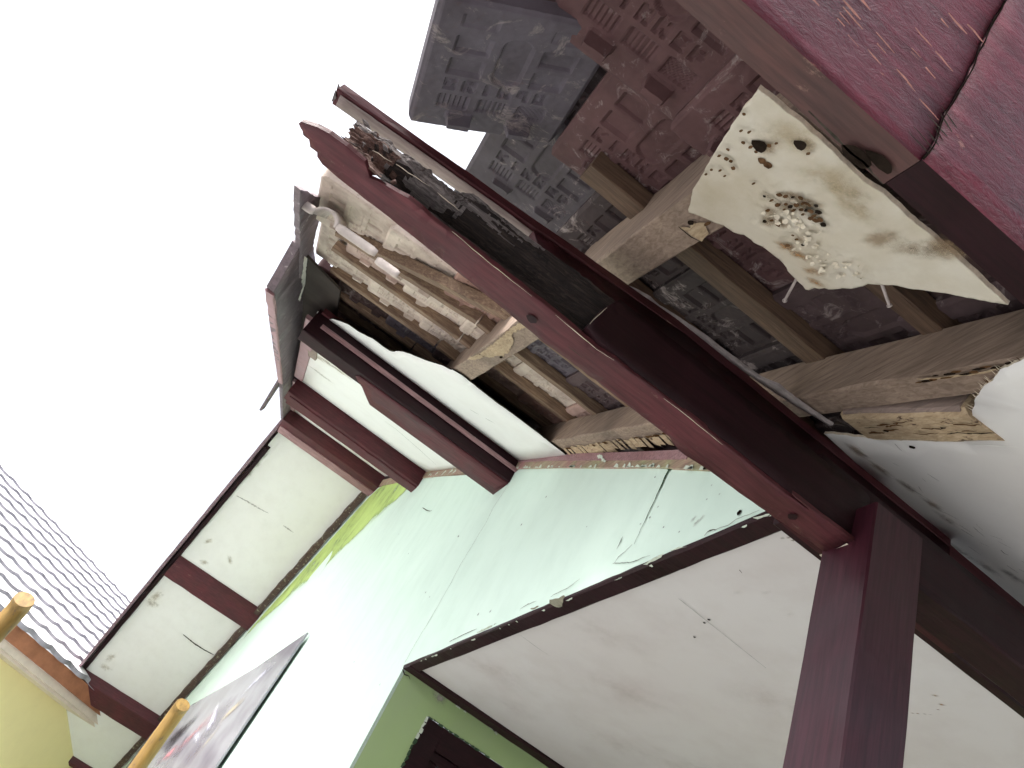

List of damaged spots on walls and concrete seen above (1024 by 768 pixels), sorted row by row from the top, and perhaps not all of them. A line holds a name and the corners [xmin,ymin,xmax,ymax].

peeling [837,0,893,64]
spalling [739,129,778,169]
peeling [761,193,863,279]
crack [616,469,671,564]